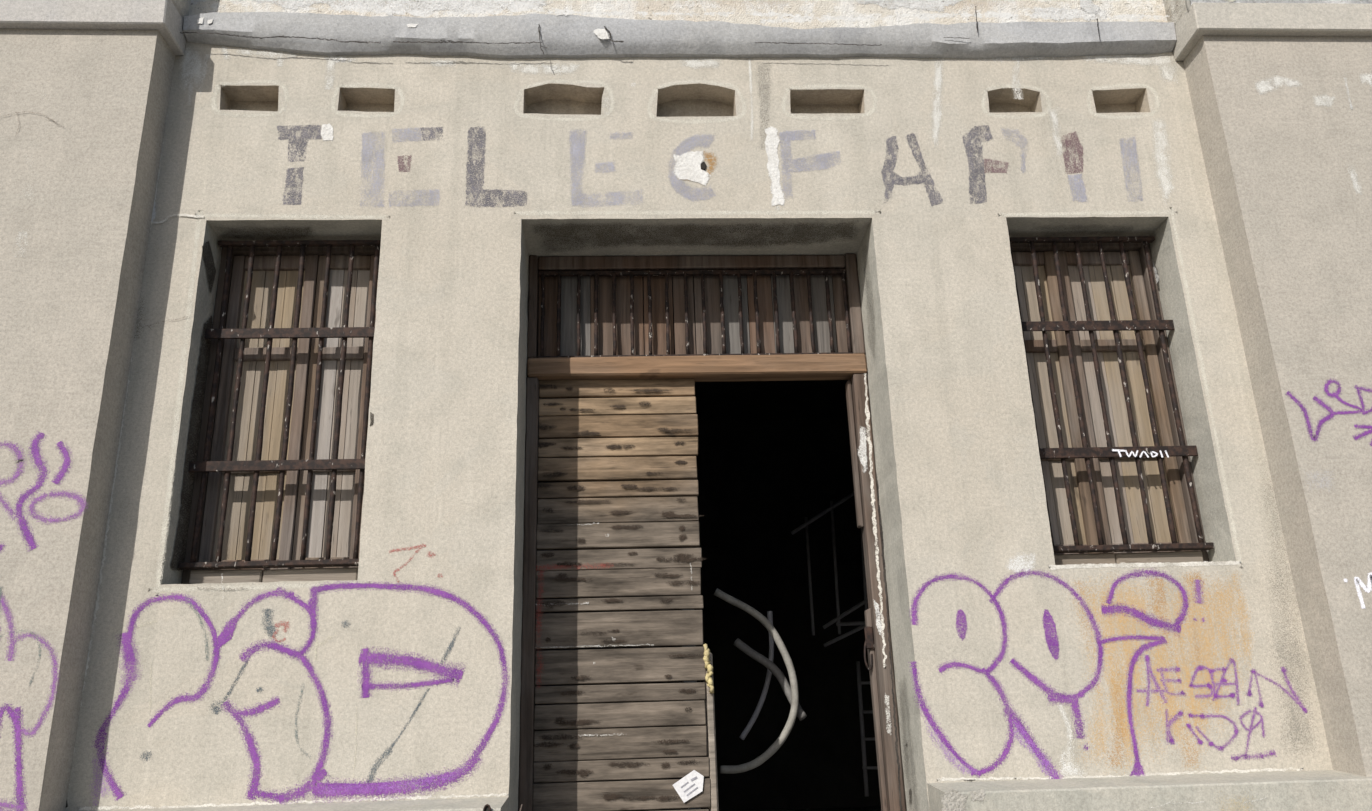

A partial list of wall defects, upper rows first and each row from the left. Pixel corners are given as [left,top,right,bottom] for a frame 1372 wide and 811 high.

peeling [295,0,1170,39]
corrosion [1062,570,1256,775]